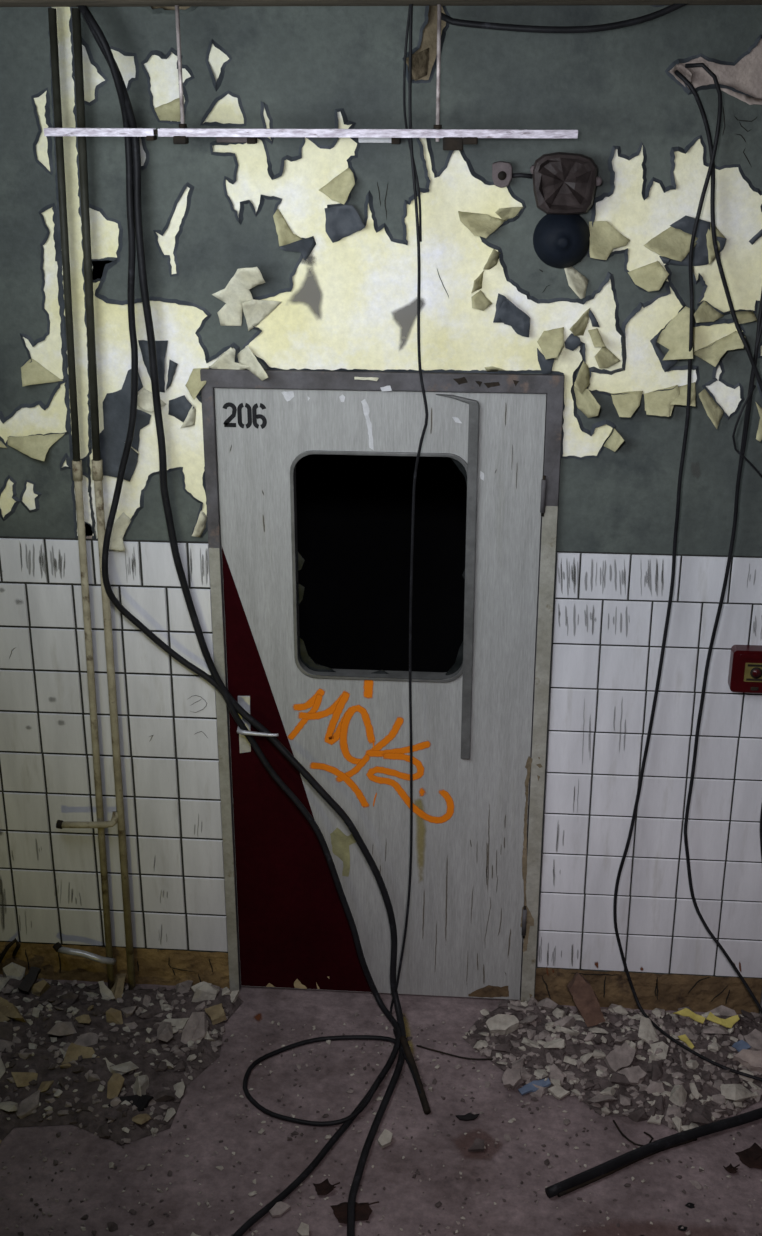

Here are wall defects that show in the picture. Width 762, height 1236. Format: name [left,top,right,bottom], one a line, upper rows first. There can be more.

peeling [0,6,762,551]